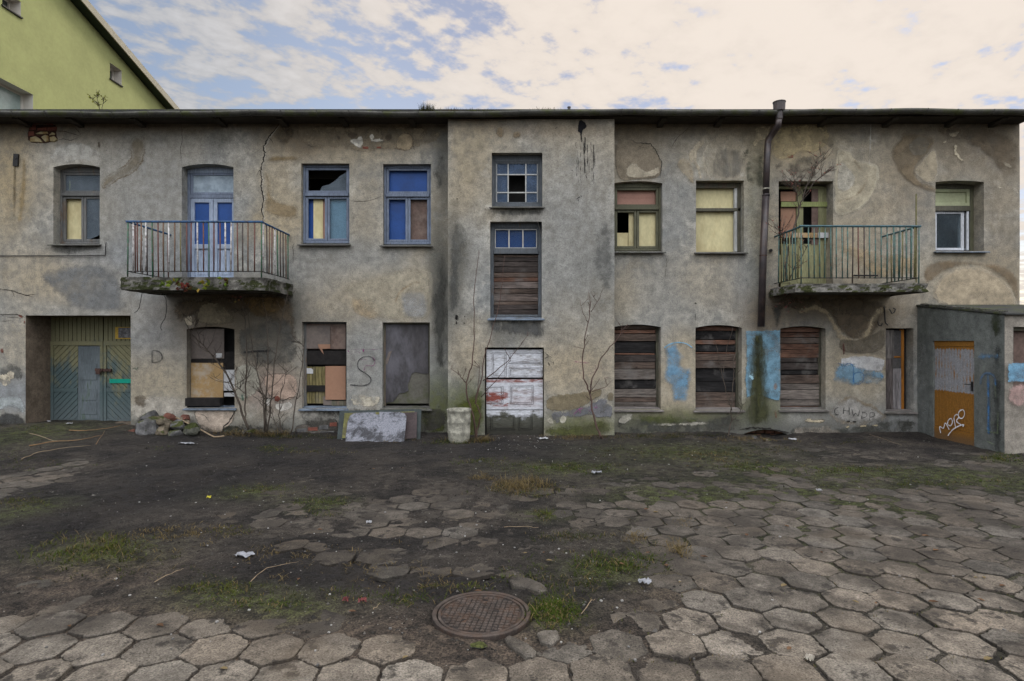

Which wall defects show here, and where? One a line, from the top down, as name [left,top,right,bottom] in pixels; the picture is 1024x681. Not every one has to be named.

crack [257,124,280,221]
flaking render [302,125,439,151]